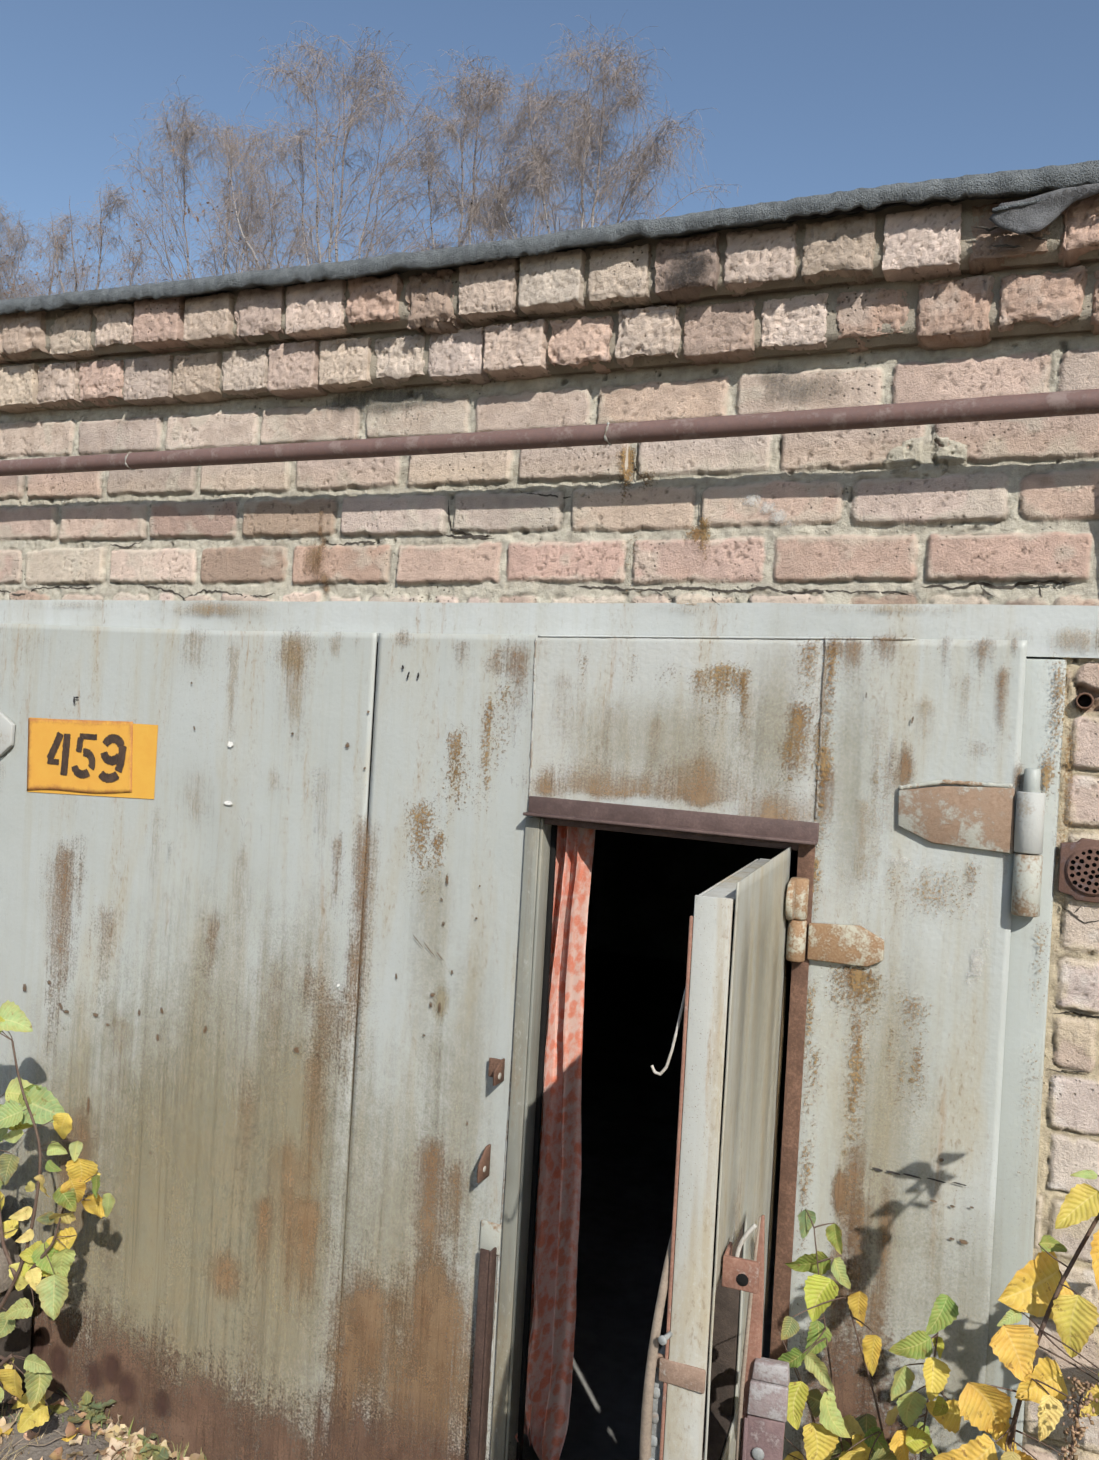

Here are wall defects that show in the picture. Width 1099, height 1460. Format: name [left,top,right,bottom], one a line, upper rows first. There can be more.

crack [578,580,1073,605]
rust [405,648,527,892]
rust [538,759,727,807]
rust [692,661,752,724]
rust [745,637,896,910]
rust [891,748,913,785]
rust [1015,661,1080,843]
rust [887,863,976,914]
rust [30,822,473,1460]
rust [789,966,931,1460]